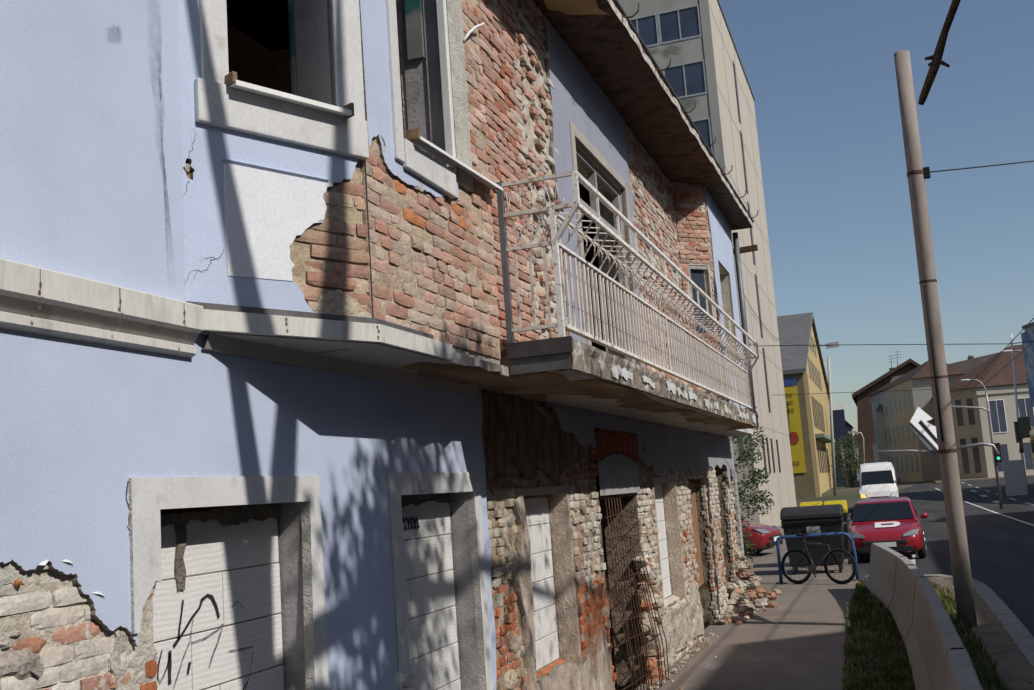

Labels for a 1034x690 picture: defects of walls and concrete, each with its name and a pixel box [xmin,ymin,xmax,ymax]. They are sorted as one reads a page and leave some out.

flaking render [0,559,158,690]
flaking render [290,0,756,690]